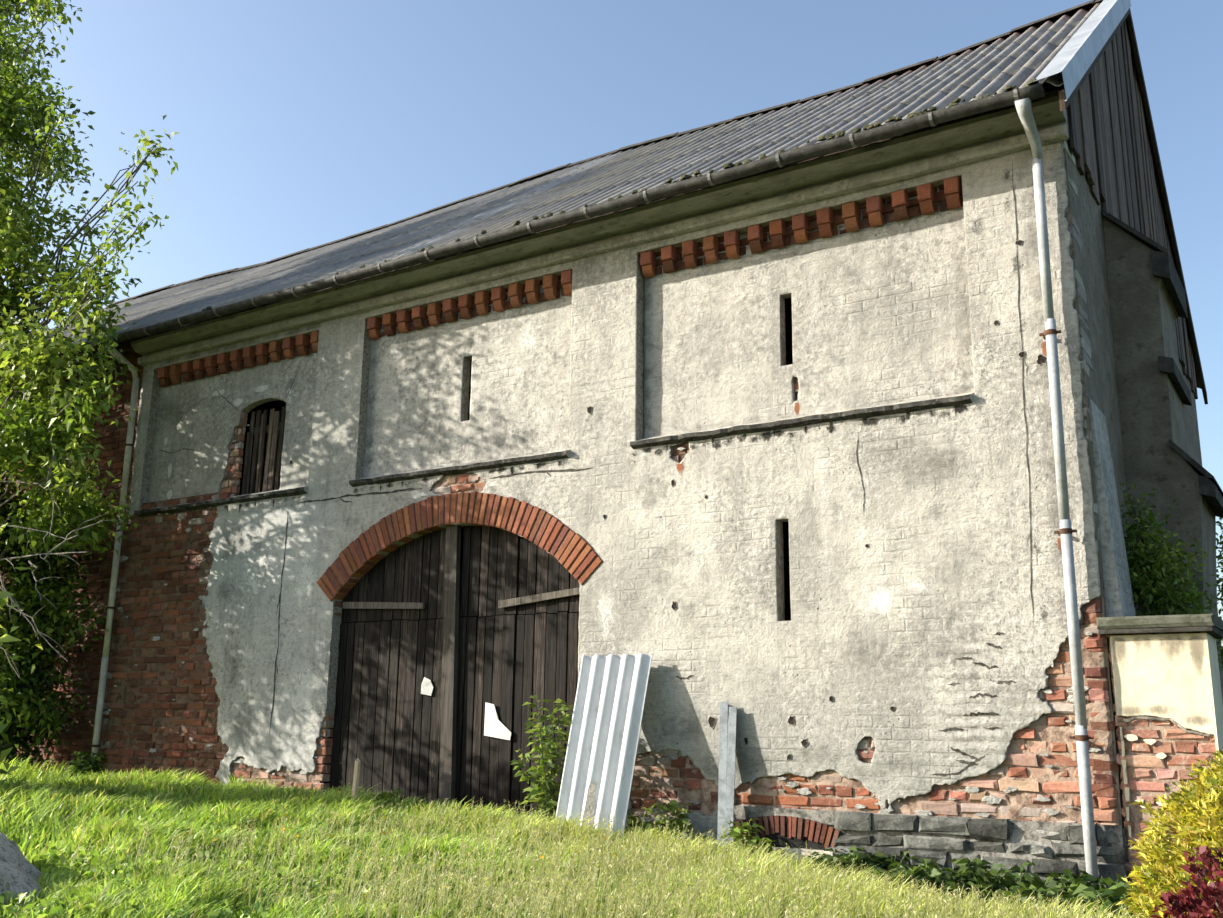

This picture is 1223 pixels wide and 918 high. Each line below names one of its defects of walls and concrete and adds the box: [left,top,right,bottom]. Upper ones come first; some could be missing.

flaking render [431,473,486,495]
crack [856,440,865,515]
crack [1012,166,1034,629]
flaking render [99,413,331,792]
crack [269,488,422,734]
flaking render [628,749,718,819]
flaking render [734,599,1212,825]